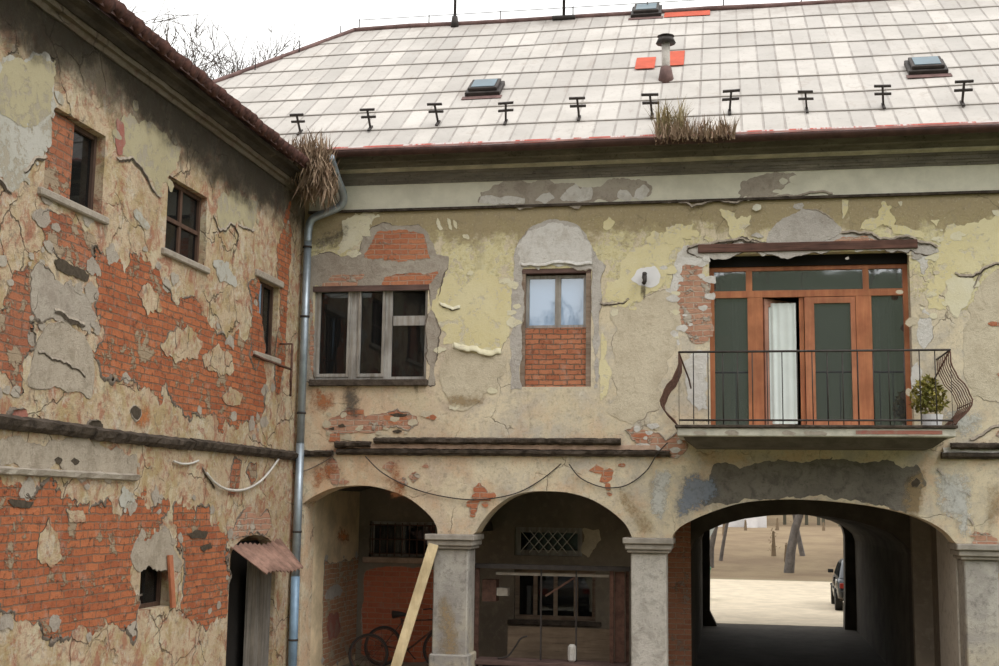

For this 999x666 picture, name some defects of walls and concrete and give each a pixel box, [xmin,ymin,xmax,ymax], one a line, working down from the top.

peeling [0,52,64,192]
crack [117,156,161,199]
peeling [112,100,181,197]
flaking render [0,190,295,440]
flaking render [306,212,525,387]
peeling [478,178,652,210]
peeling [514,171,999,411]
crack [841,230,938,248]
crack [955,262,999,289]
flaking render [320,407,437,488]
flaking render [466,483,496,517]
flaking render [0,456,272,647]